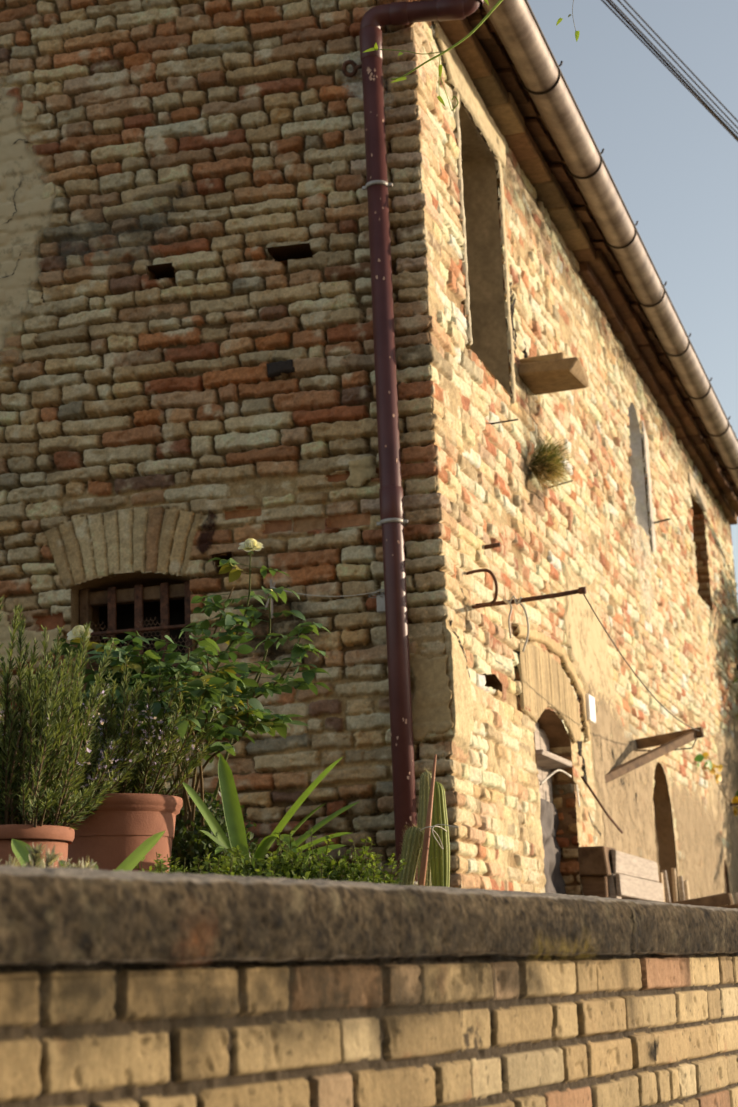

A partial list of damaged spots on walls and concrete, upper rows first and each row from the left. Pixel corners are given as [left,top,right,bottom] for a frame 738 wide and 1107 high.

flaking render [0,88,57,358]
spalling [0,611,66,671]